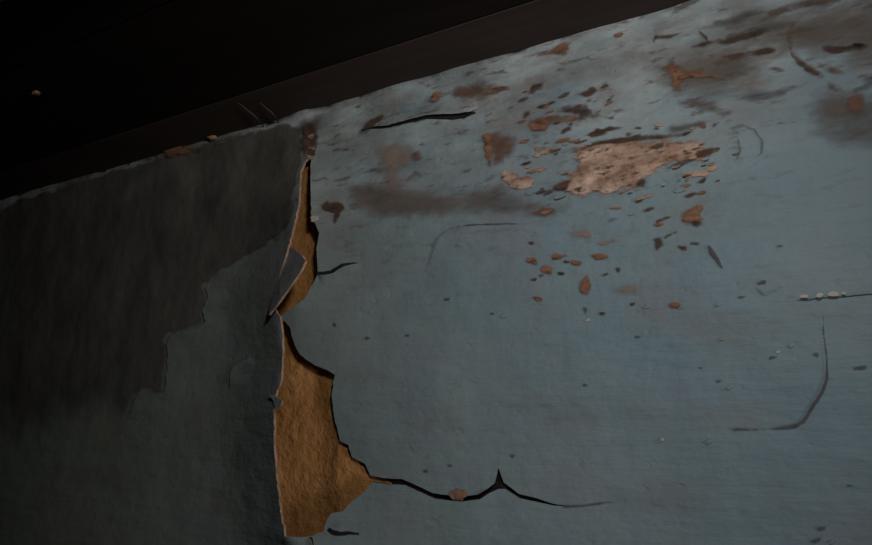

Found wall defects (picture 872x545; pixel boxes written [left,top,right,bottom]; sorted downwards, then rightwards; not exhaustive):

flaking render [502,84,720,226]
crack [316,262,363,287]
flaking render [526,253,581,281]
flaking render [580,276,591,294]
peeling [0,124,411,545]
crack [733,325,828,430]
crack [376,471,608,508]